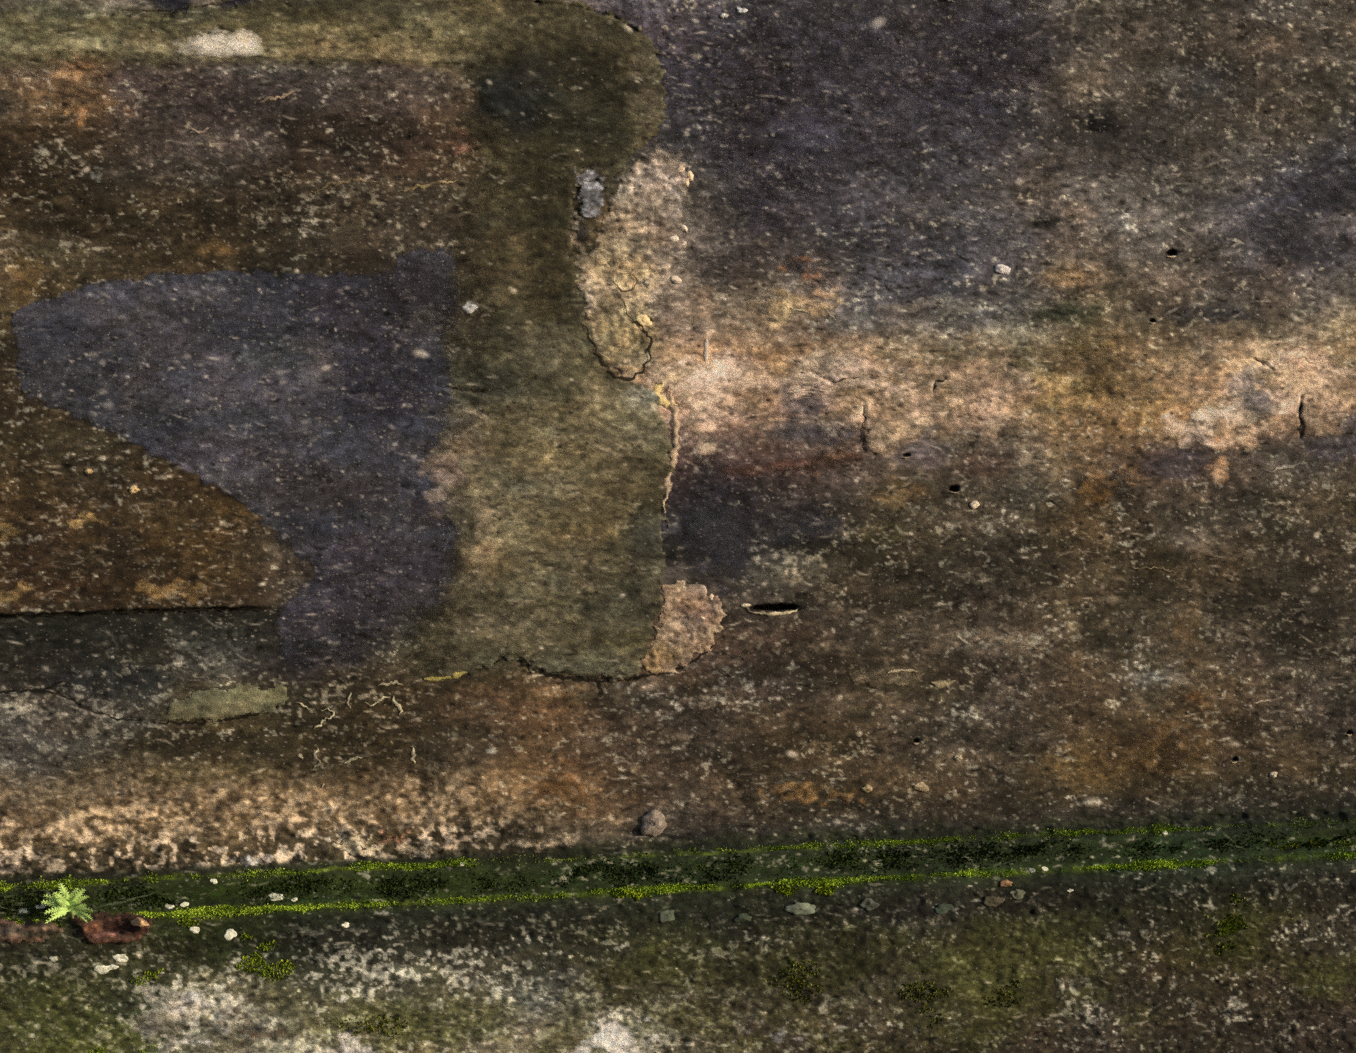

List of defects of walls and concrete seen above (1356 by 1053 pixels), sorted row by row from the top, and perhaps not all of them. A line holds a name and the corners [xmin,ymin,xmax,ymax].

damp [12,247,465,666]
crack [477,637,722,697]
spalling [571,149,694,513]
spalling [640,580,727,675]